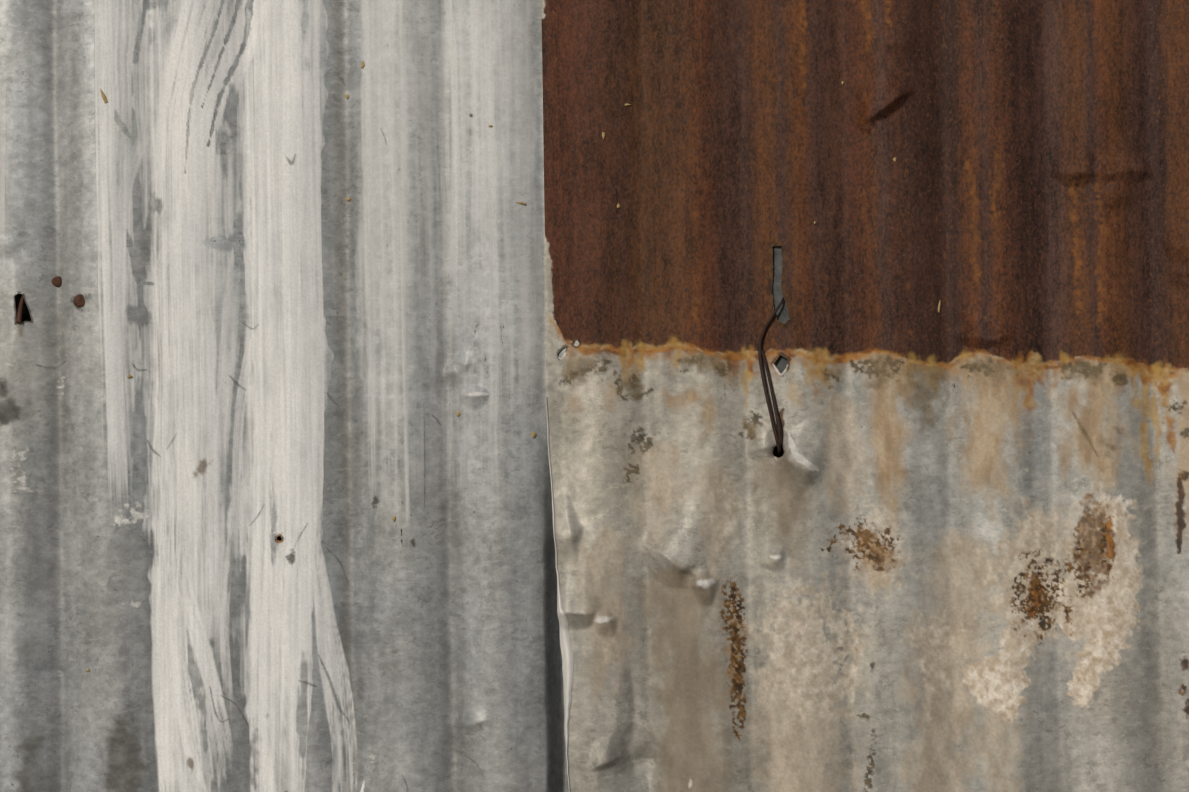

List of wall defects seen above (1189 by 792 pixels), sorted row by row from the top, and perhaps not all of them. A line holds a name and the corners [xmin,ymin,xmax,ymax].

rust [541,0,1189,512]
leakage [354,0,1189,792]
rust [1069,485,1109,583]
rust [1173,469,1189,555]
rust [717,571,752,747]